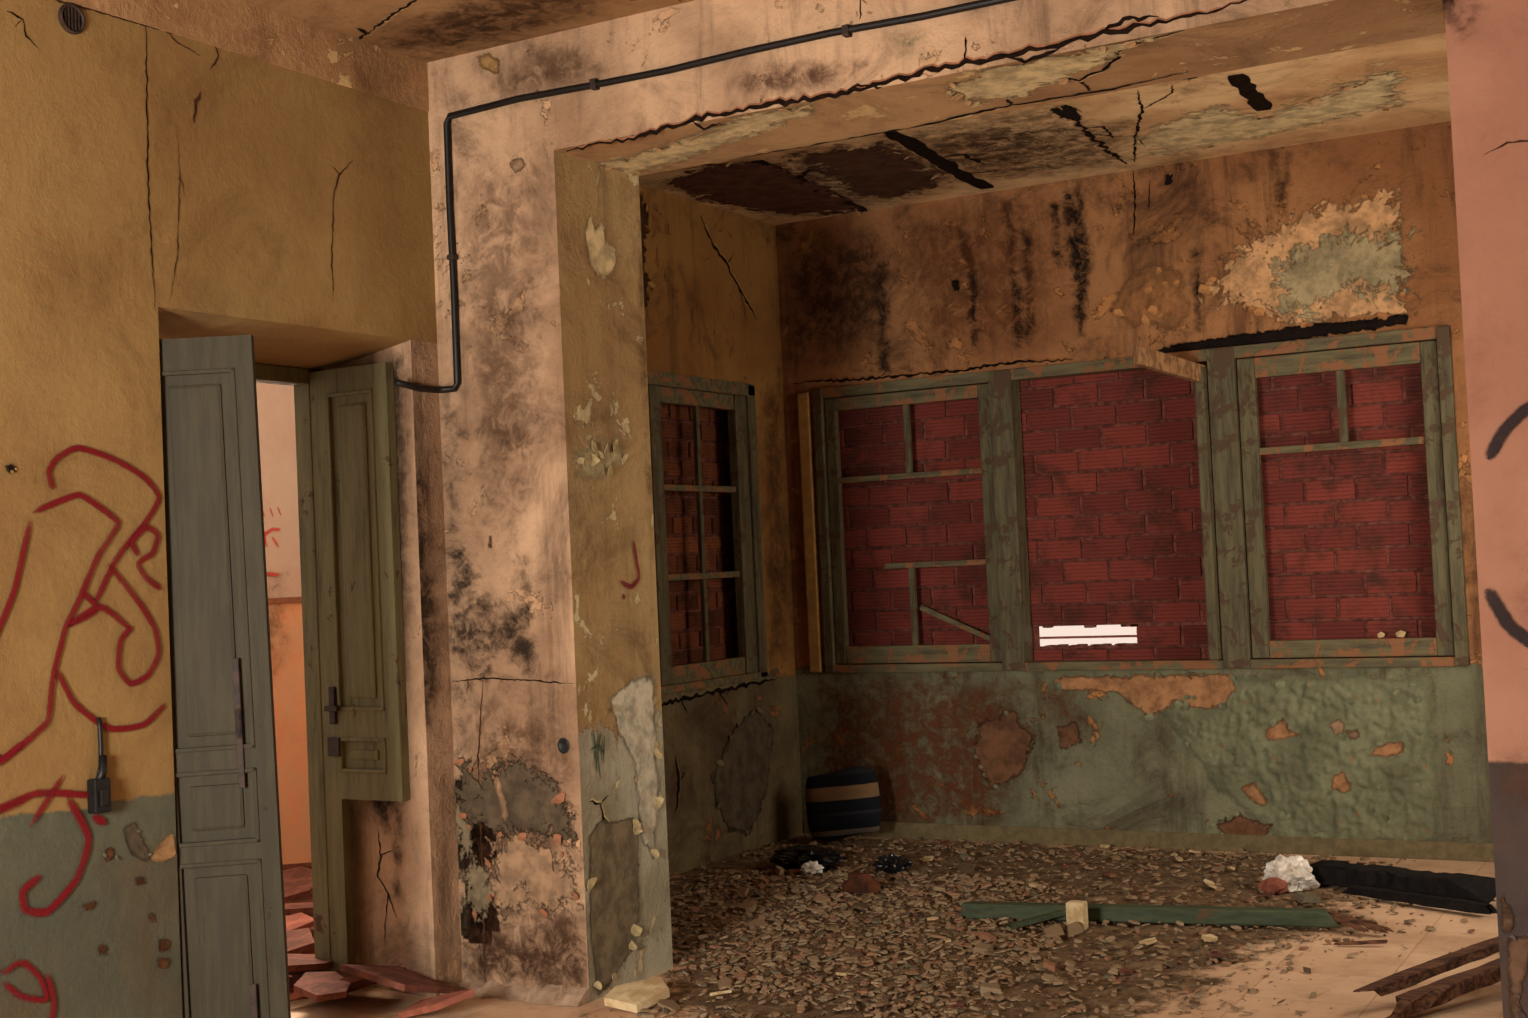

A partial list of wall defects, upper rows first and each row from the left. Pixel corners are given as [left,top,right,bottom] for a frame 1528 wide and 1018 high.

crack [56,0,219,307]
peeling [584,215,616,279]
spalling [595,102,953,307]
leakage [792,248,888,369]
crack [566,0,1247,235]
leakage [879,116,1115,187]
leakage [1051,191,1090,333]
crack [1228,74,1272,121]
peeling [1158,181,1422,358]
crack [1484,140,1528,155]
peeling [1055,672,1236,721]
peeling [453,676,665,996]